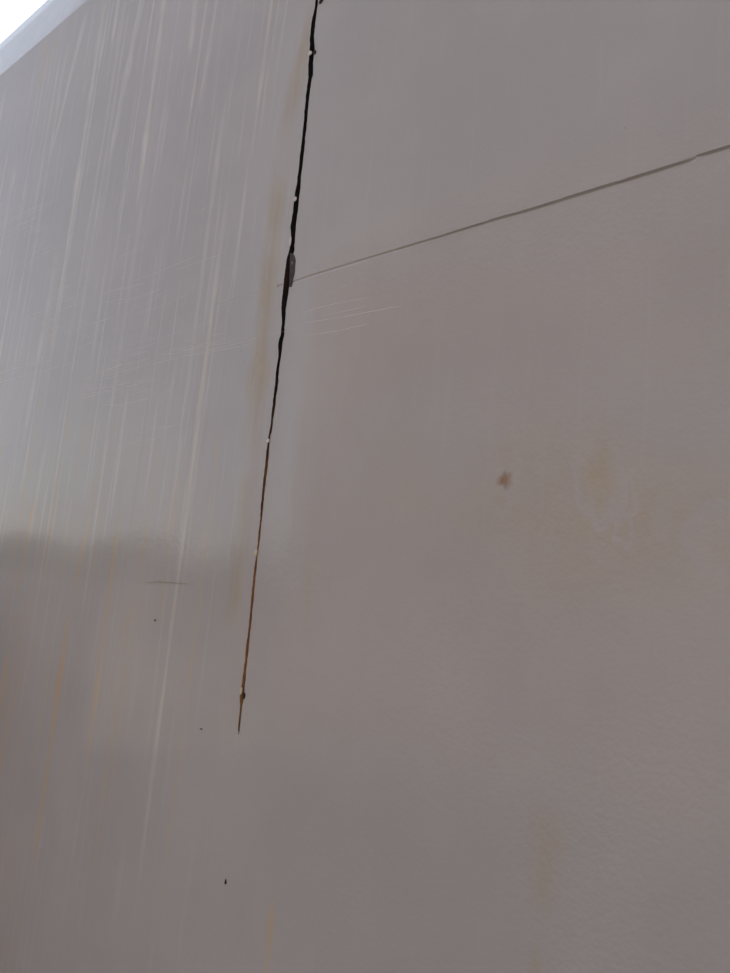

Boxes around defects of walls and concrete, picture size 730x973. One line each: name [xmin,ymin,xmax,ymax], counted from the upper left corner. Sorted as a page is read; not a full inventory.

crack [238,0,323,731]